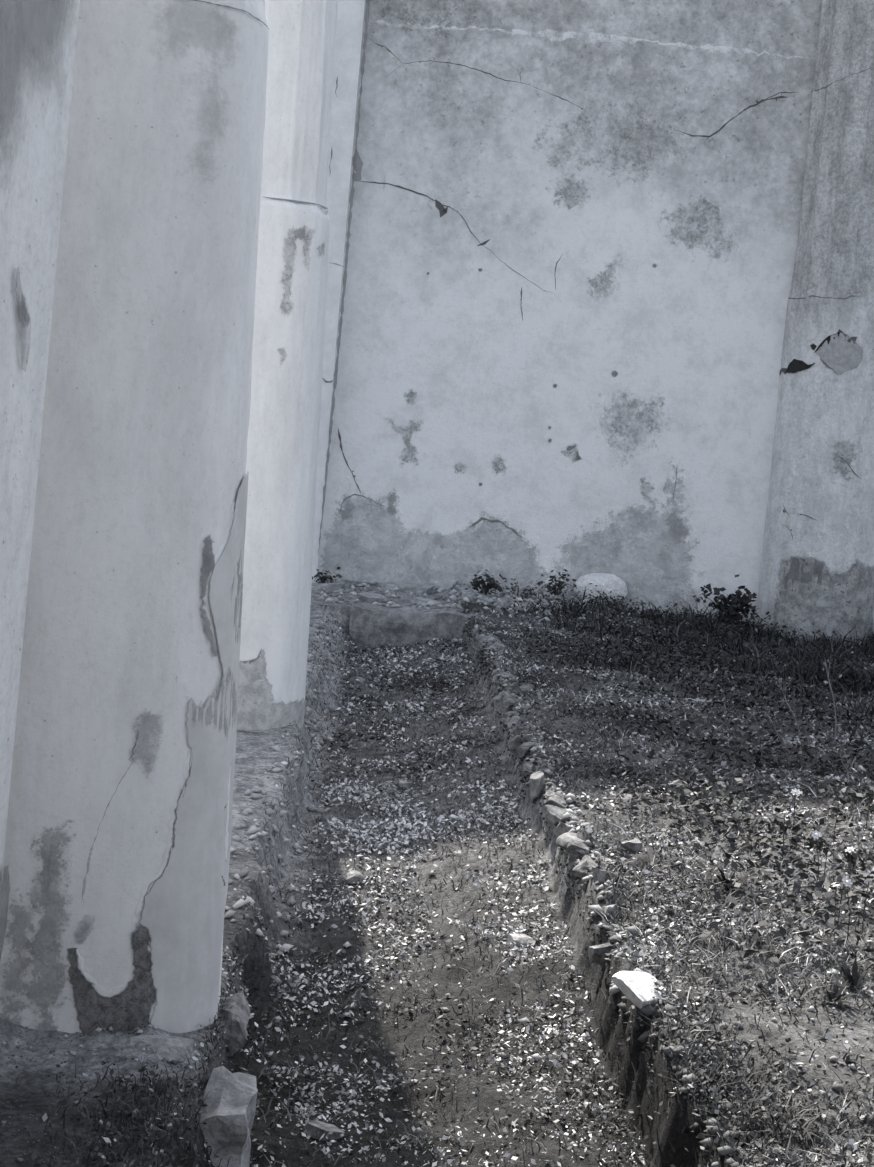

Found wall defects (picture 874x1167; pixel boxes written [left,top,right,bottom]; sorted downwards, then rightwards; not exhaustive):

damp [0,0,70,149]
crack [194,0,269,29]
crack [680,67,871,140]
crack [265,0,583,551]
spalling [779,329,863,375]
flaking render [0,472,305,1034]